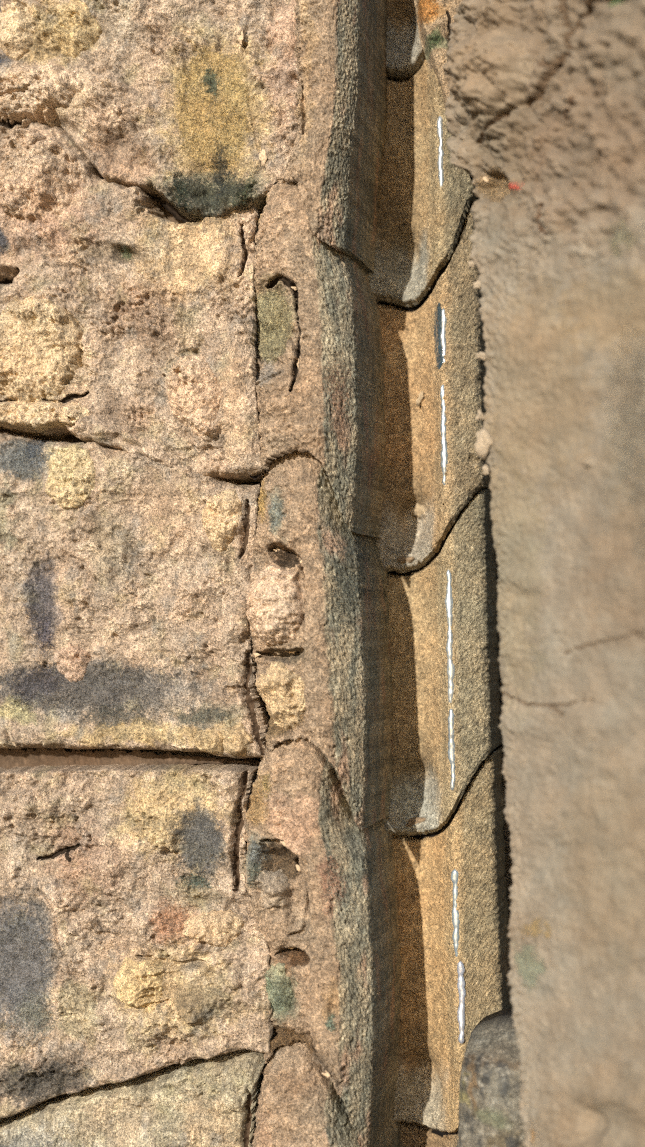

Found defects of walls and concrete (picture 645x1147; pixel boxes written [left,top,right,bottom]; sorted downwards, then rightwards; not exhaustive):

crack [444,11,452,41]
crack [476,0,611,144]
crack [0,118,22,129]
water stain [173,171,188,207]
water stain [211,148,257,209]
crack [148,194,192,223]
flaking render [474,409,493,475]
crack [564,628,645,654]
crack [503,691,593,716]